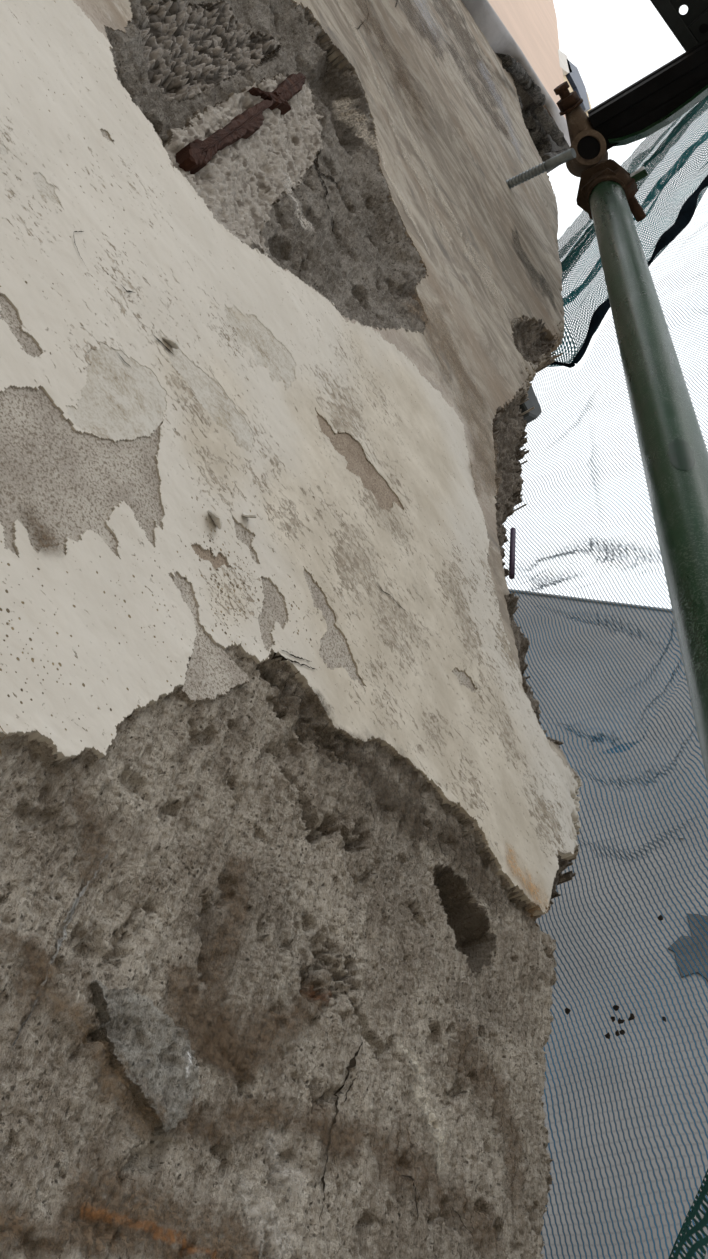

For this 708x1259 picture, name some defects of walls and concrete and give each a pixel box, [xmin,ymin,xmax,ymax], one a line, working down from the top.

spalling [104,0,428,335]
peeling [0,342,167,556]
peeling [158,330,255,452]
peeling [317,415,403,512]
spalling [0,510,576,1259]
crack [319,1023,363,1223]